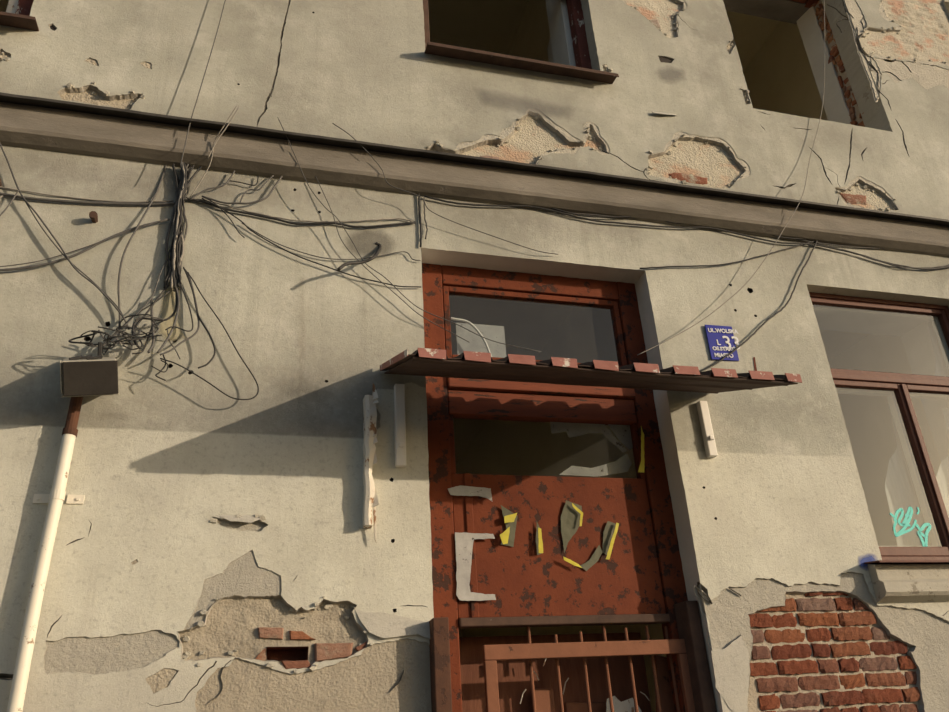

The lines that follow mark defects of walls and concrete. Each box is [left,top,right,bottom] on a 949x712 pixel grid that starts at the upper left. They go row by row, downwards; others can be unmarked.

flaking render [623,0,687,38]
crack [257,0,291,125]
flaking render [827,0,949,102]
flaking render [57,81,145,110]
flaking render [425,108,610,165]
flaking render [643,131,751,188]
flaking render [819,167,899,212]
peeling [44,550,432,712]
flaking render [694,572,949,712]